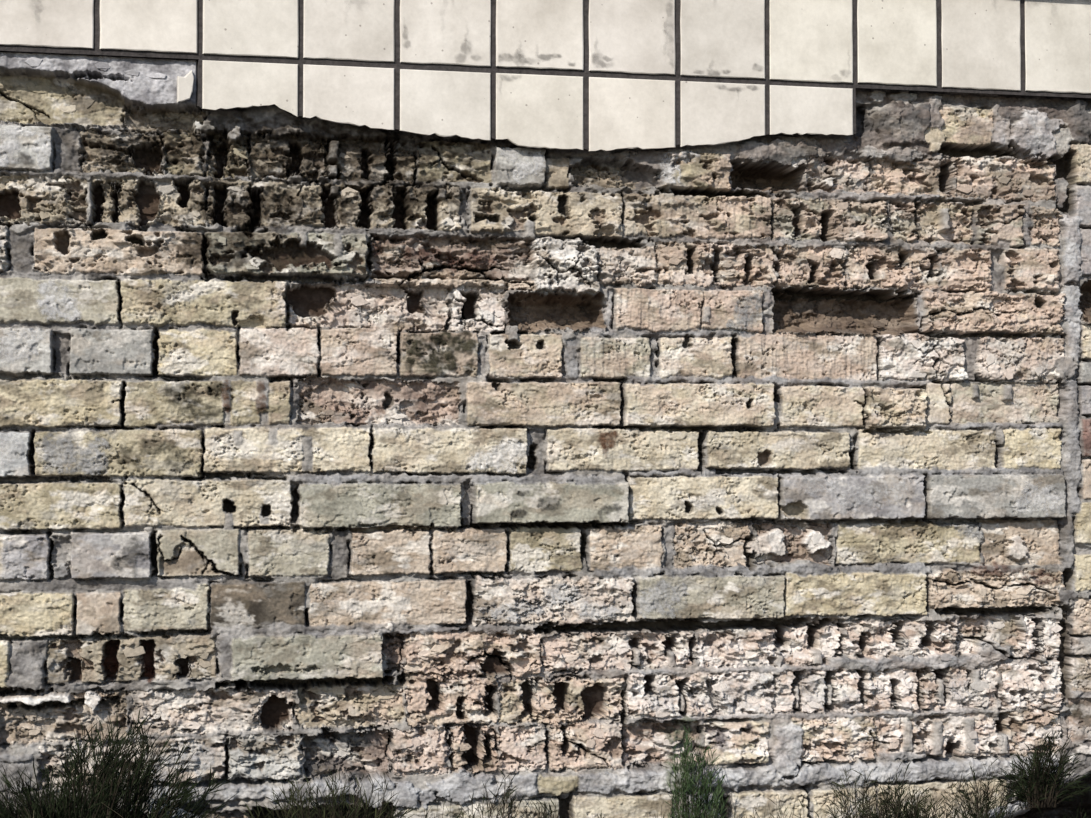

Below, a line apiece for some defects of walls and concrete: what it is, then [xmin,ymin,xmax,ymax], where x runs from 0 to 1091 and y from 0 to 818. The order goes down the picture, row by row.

crack [0,92,48,117]
spalling [0,52,607,333]
crack [918,308,1016,365]
crack [132,483,233,576]
crack [935,579,1048,602]
spalling [0,568,1066,782]